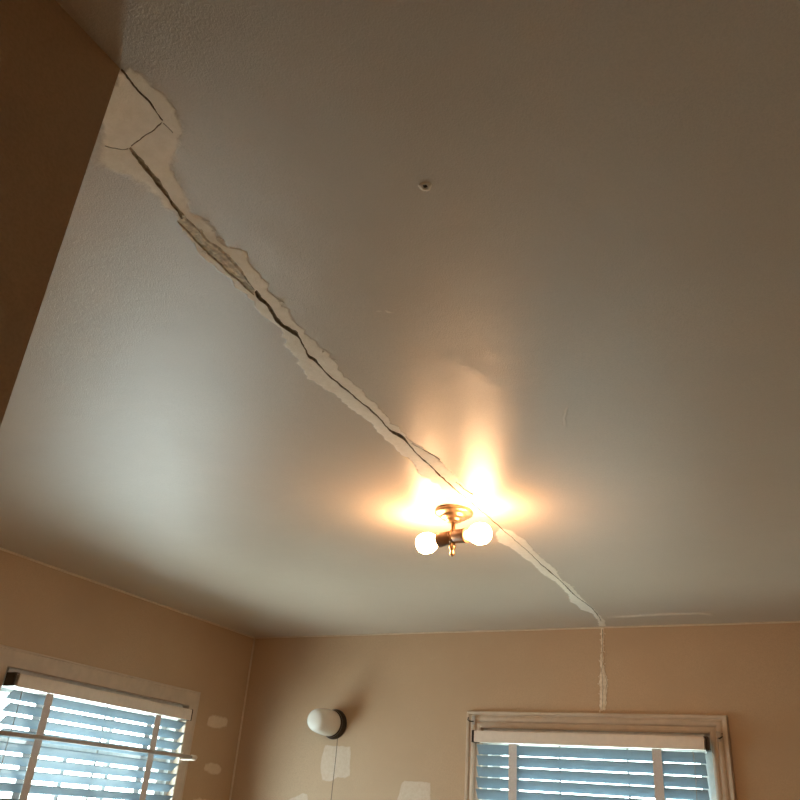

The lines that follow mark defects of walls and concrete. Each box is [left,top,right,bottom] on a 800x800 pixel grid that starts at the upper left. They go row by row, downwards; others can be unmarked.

peeling [87,65,477,503]
crack [105,69,609,713]